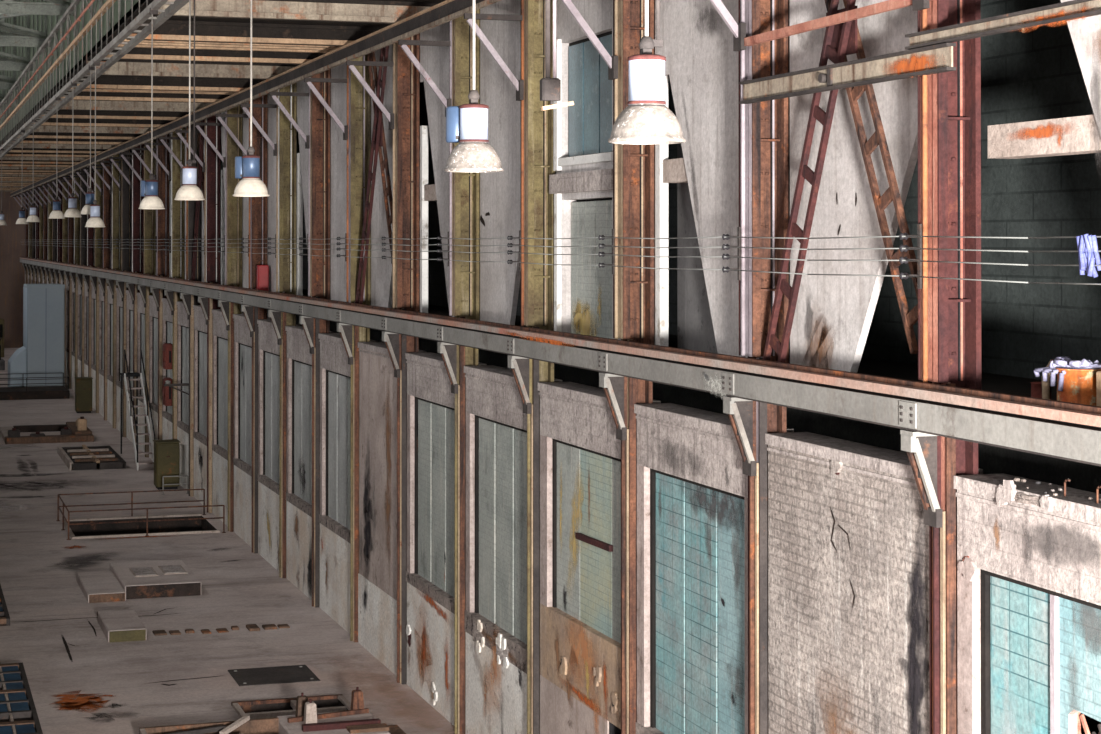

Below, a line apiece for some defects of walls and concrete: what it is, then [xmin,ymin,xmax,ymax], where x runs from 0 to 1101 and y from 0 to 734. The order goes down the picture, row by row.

corrosion [1021,11,1068,31]
corrosion [891,55,932,77]
corrosion [1019,124,1062,145]
crack [830,507,850,551]
damp [1028,528,1098,562]
corrosion [424,595,446,621]
corrosion [408,635,430,671]
damp [910,609,927,711]
corrosion [555,629,608,730]